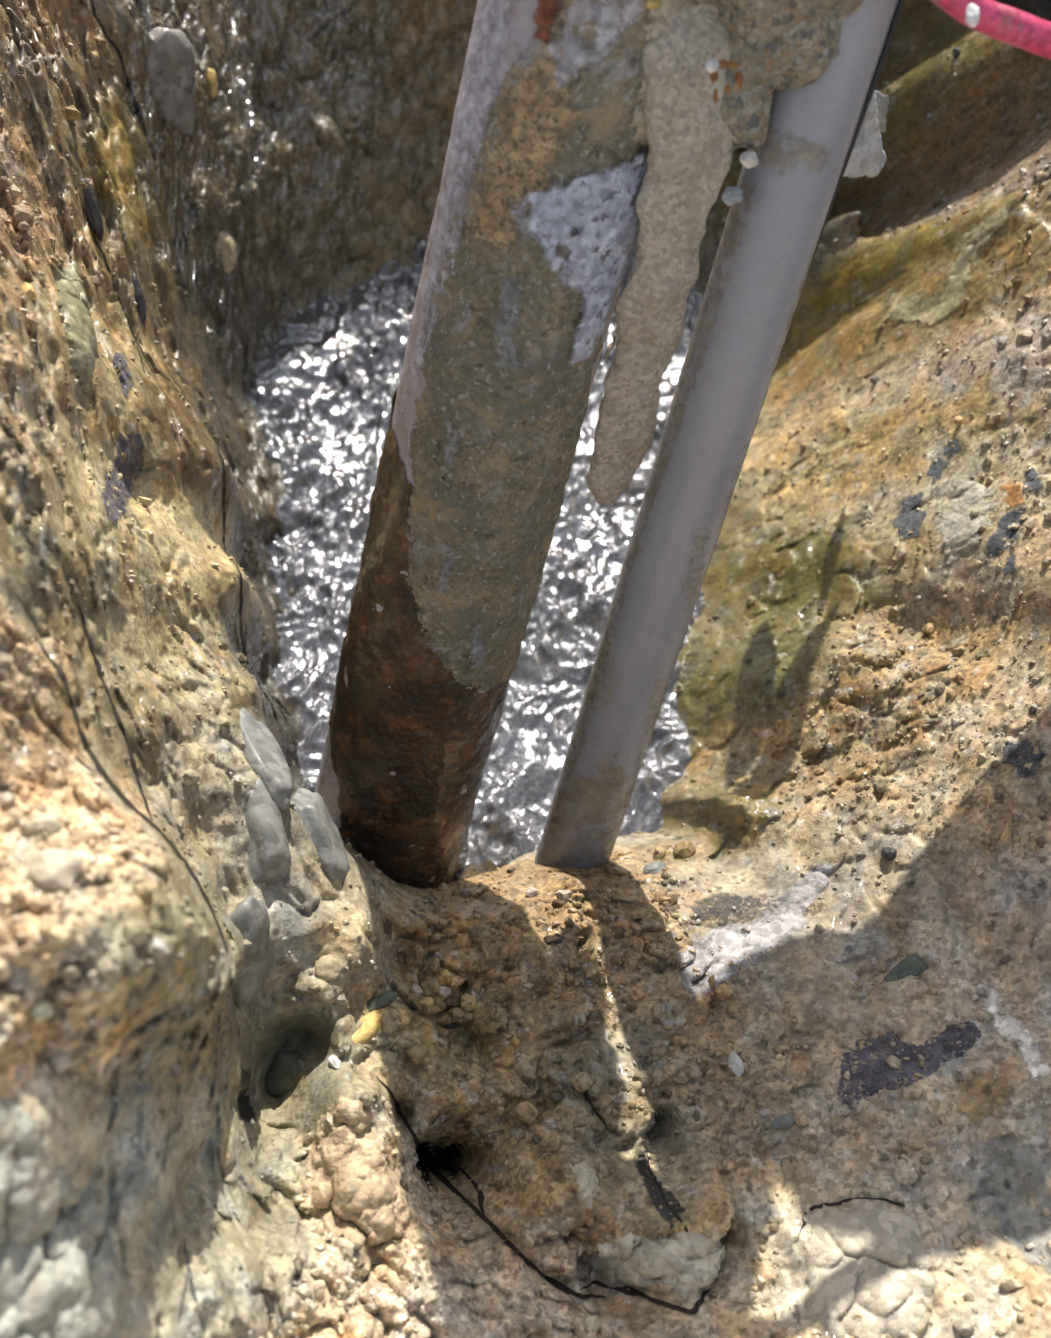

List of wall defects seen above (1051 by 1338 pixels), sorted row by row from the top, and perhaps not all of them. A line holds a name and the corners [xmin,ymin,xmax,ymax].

crack [91,0,154,159]
rust [533,0,564,47]
water stain [493,276,521,368]
peeling [511,155,648,364]
rust [329,388,511,889]
crack [41,603,228,953]
crack [377,1077,719,1315]
crack [579,1066,609,1132]